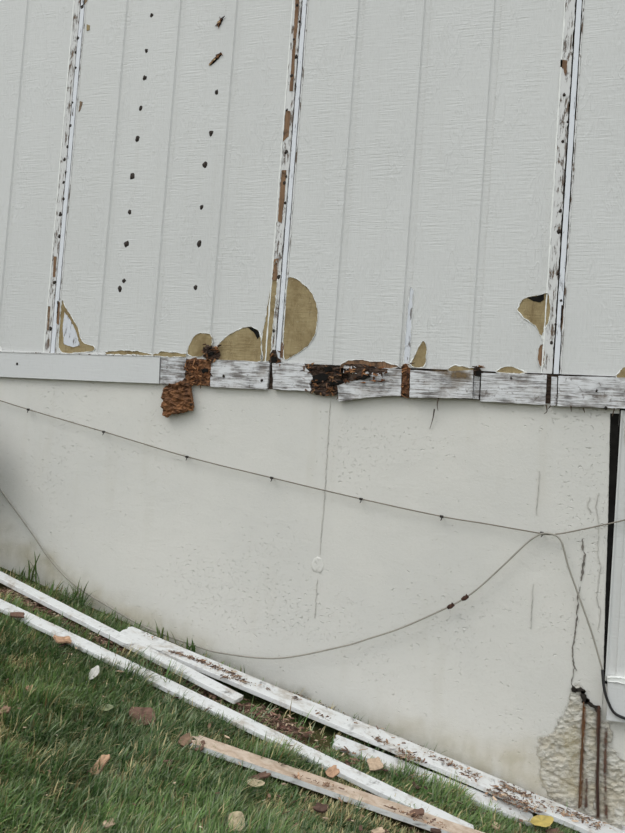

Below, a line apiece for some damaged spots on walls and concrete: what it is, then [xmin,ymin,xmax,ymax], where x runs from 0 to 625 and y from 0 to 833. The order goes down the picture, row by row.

peeling [289,0,299,91]
peeling [283,110,291,141]
peeling [278,170,286,223]
peeling [47,301,95,353]
peeling [105,258,318,362]
peeling [517,293,551,367]
crack [571,413,619,712]
spalling [537,685,625,830]
corrosion [579,707,608,819]